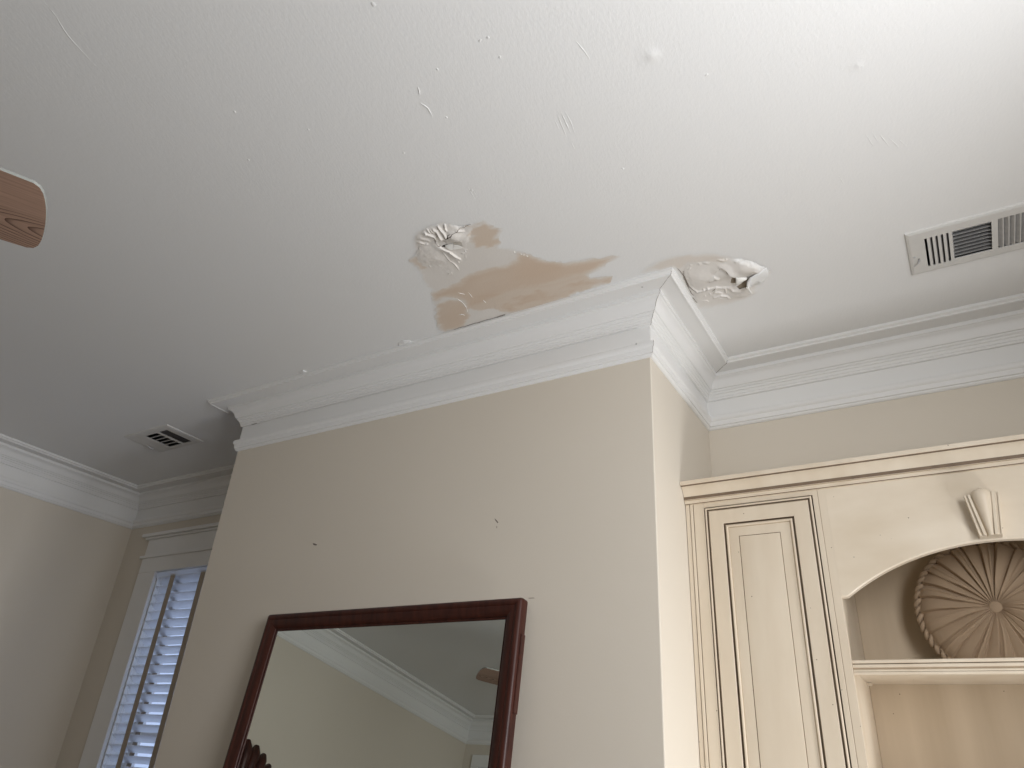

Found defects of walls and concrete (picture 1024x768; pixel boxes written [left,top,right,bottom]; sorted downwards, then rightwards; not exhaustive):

peeling [414,223,474,276]
peeling [683,257,773,304]